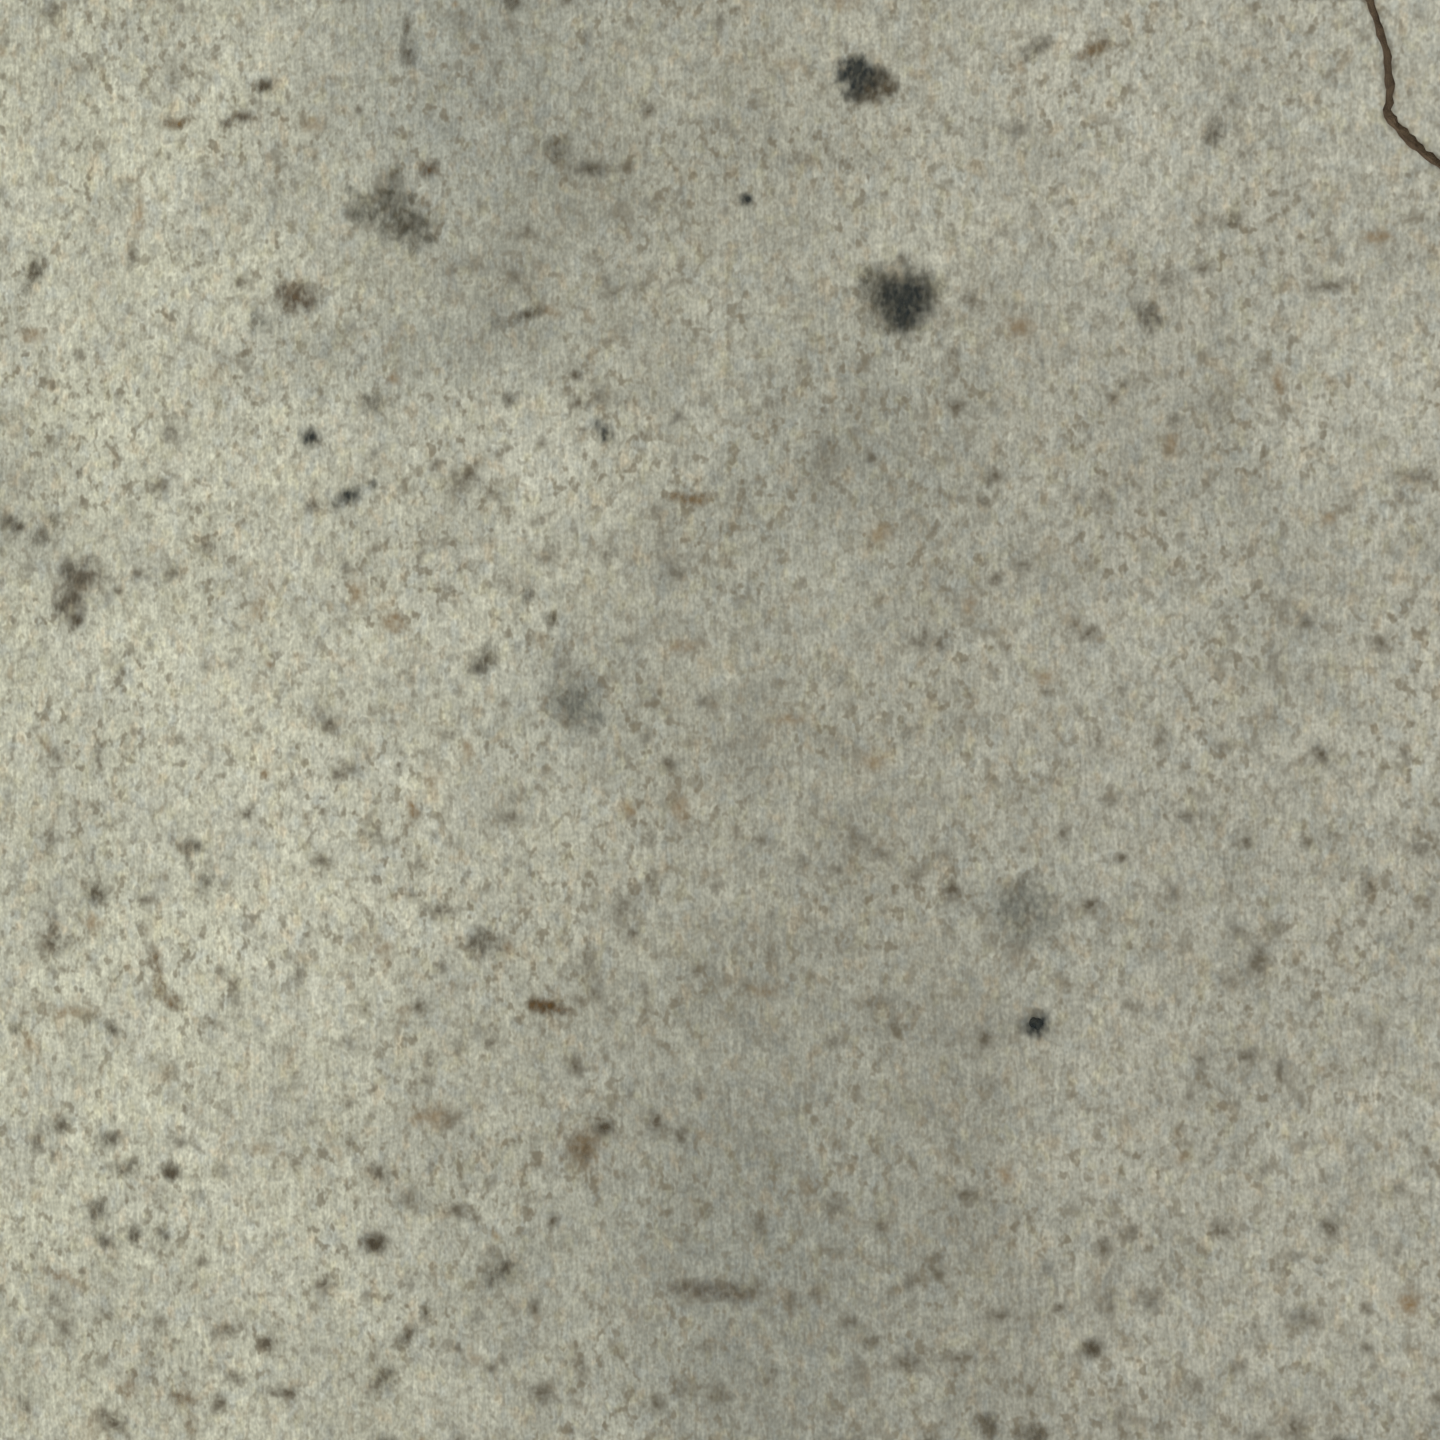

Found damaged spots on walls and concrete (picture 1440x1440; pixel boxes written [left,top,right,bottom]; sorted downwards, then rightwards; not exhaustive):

crack [1365,0,1440,169]